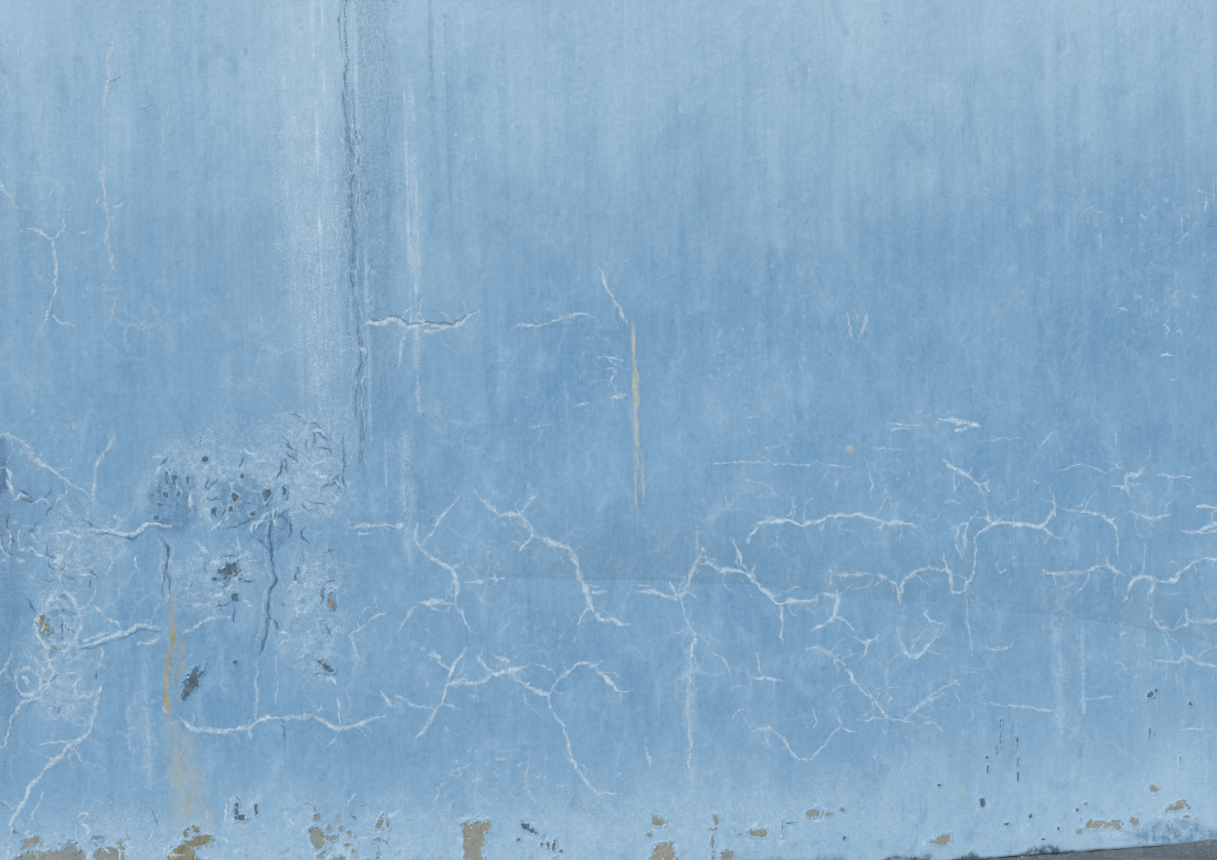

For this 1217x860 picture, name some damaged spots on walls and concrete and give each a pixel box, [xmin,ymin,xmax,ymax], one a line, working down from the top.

crack [0,0,632,860]
rust [630,324,646,509]
spalling [150,454,211,525]
spalling [208,471,291,522]
crack [636,417,1217,780]
peeling [7,830,132,860]
peeling [161,822,216,860]
peeling [303,810,393,860]
peeling [455,813,495,860]
peeling [513,816,567,857]
peeling [643,809,683,860]